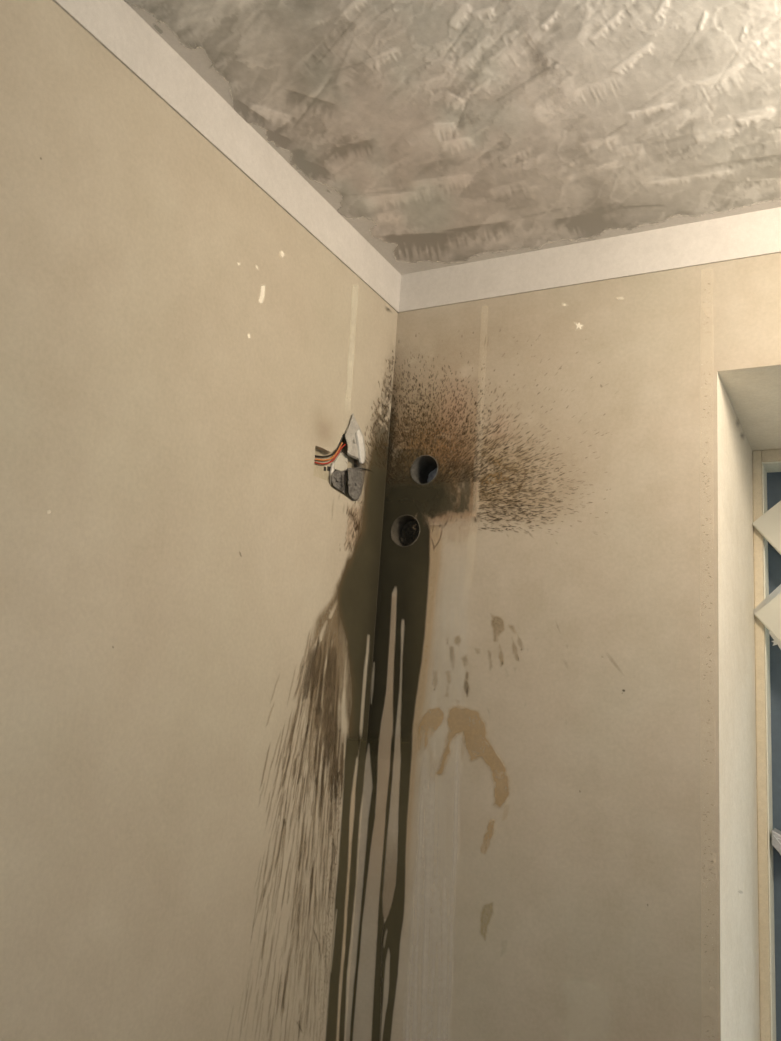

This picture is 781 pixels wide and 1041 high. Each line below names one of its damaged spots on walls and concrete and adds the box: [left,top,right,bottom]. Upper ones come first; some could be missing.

damp [261,350,585,1041]